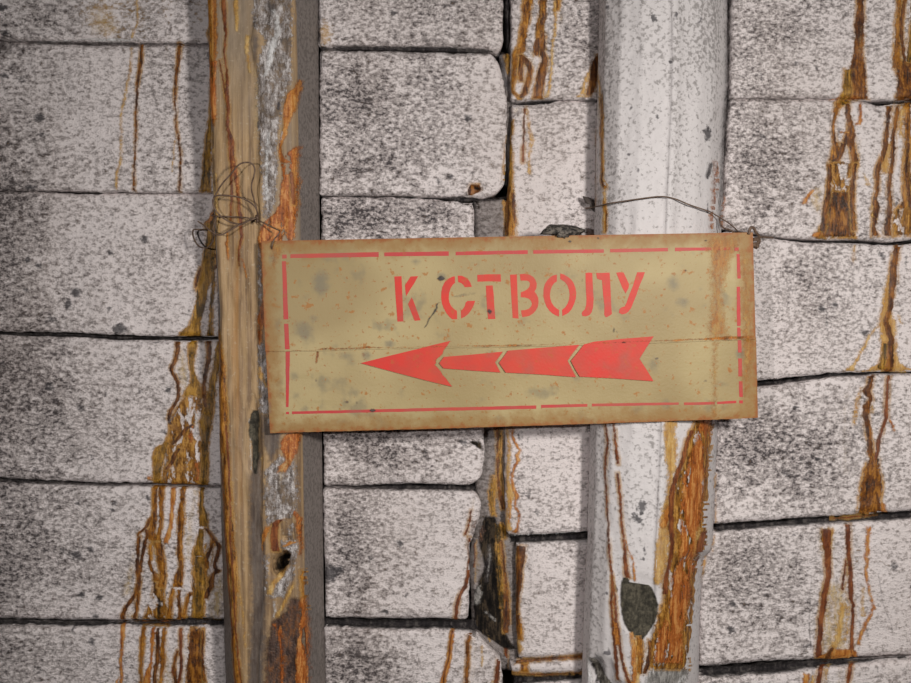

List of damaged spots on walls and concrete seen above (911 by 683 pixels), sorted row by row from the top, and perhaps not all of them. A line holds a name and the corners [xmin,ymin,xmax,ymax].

rust [502,0,561,236]
rust [115,0,250,683]
rust [802,0,911,683]
rust [440,510,476,683]
rust [464,633,490,683]
rust [488,427,583,683]
spalling [586,648,612,683]
rust [604,420,722,683]
spalling [645,659,689,683]